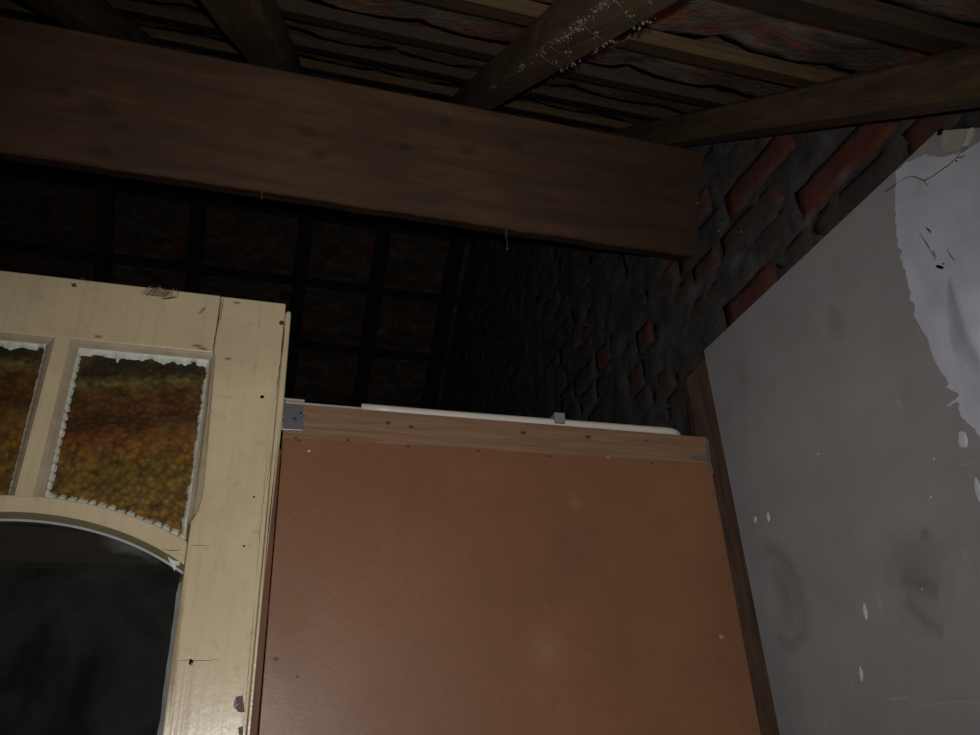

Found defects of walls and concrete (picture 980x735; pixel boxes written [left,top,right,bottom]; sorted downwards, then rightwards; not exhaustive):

crack [885,147,967,192]